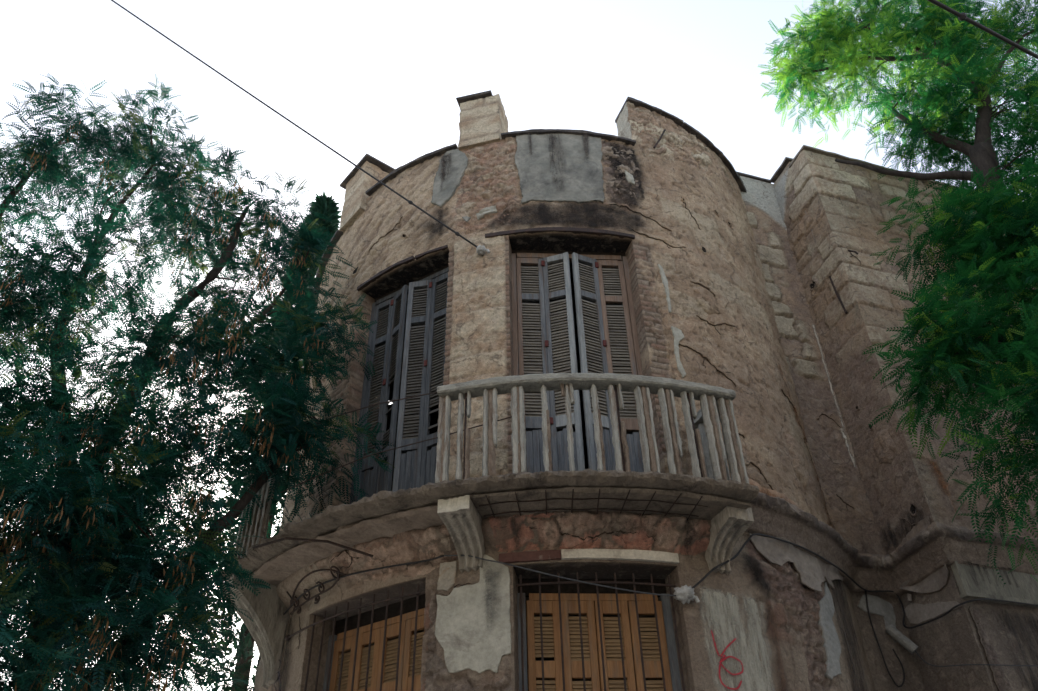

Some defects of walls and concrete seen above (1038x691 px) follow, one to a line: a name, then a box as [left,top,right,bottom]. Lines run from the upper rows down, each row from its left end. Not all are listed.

crack [606,196,701,249]
crack [691,280,736,335]
crack [679,343,737,386]
flaking render [309,489,710,673]
flaking render [745,533,843,691]
flaking render [857,559,962,643]